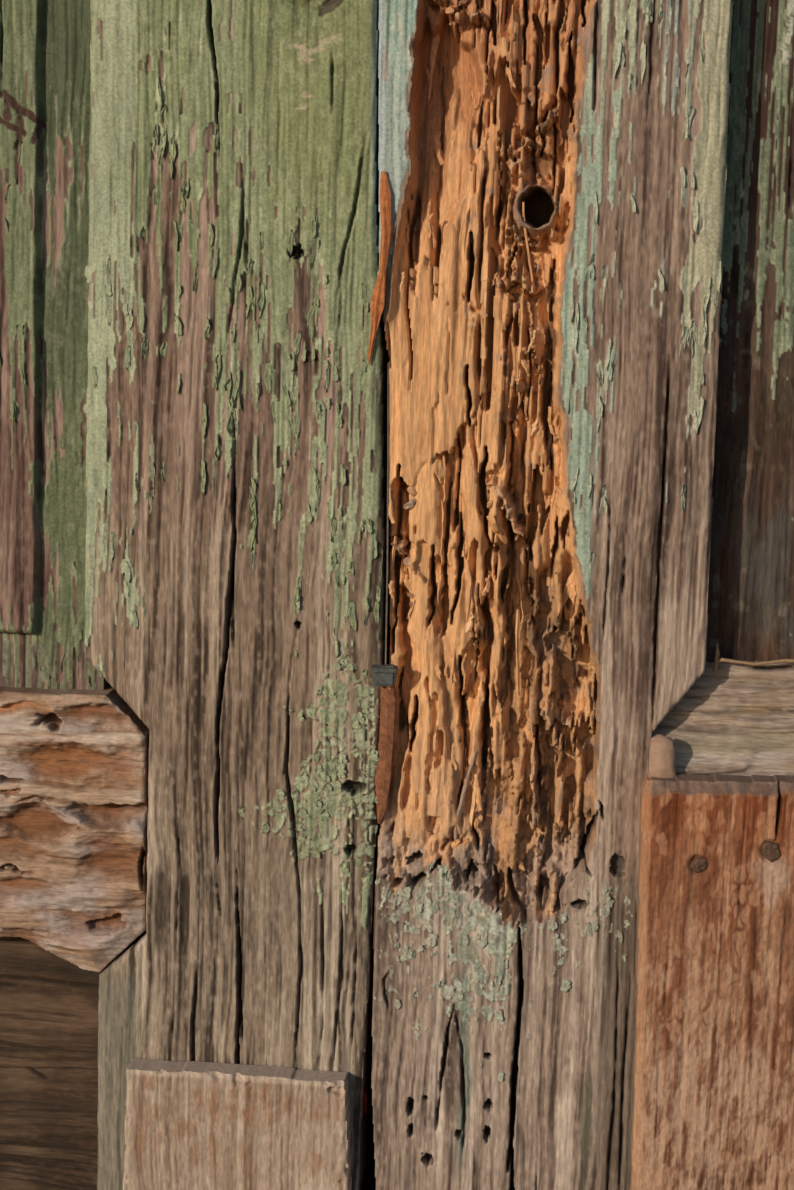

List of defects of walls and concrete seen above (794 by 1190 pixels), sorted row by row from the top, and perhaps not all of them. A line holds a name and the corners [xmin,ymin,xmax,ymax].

crack [206,0,220,146]
peeling [563,0,722,598]
peeling [0,0,513,1099]
crack [234,890,243,1064]
peeling [528,803,641,1021]